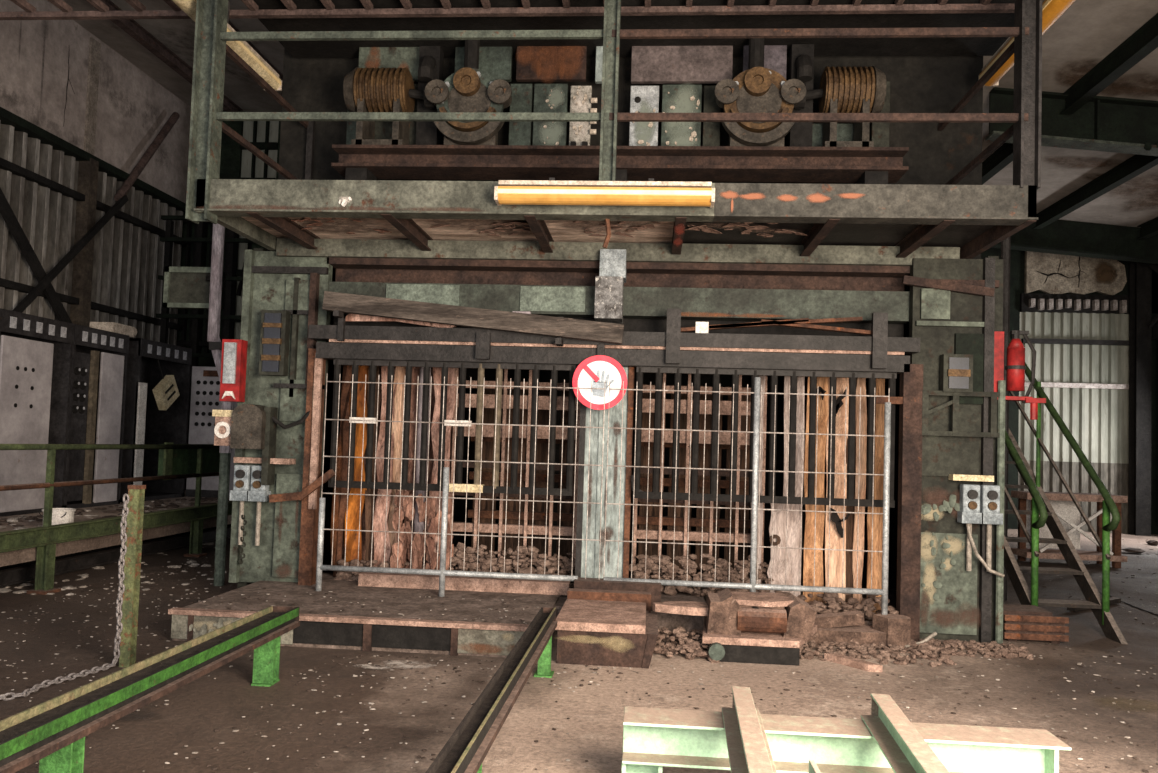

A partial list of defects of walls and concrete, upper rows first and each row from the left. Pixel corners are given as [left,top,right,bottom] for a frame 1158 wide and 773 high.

rust [722,191,764,211]
rust [778,193,863,202]
peeling [921,494,964,602]